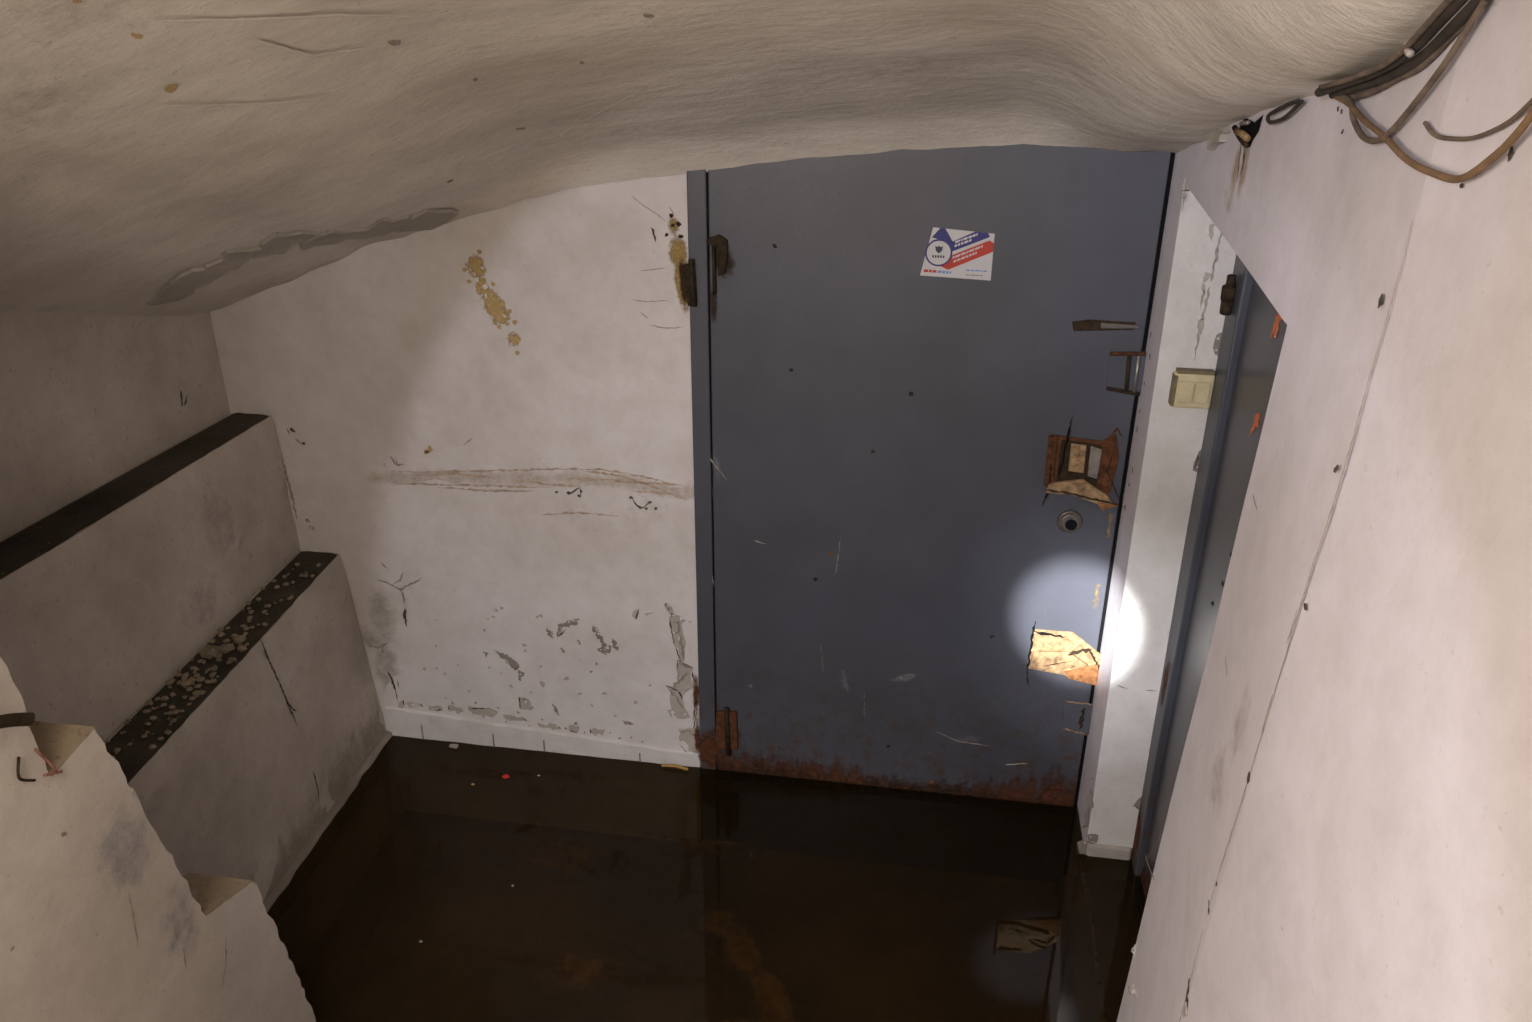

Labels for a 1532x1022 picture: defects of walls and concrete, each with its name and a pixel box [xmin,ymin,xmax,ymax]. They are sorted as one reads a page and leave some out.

rust [665,214,688,311]
crack [369,561,420,700]
spalling [398,644,644,743]
peeling [536,614,619,673]
spalling [632,603,700,754]
rust [695,727,1077,807]